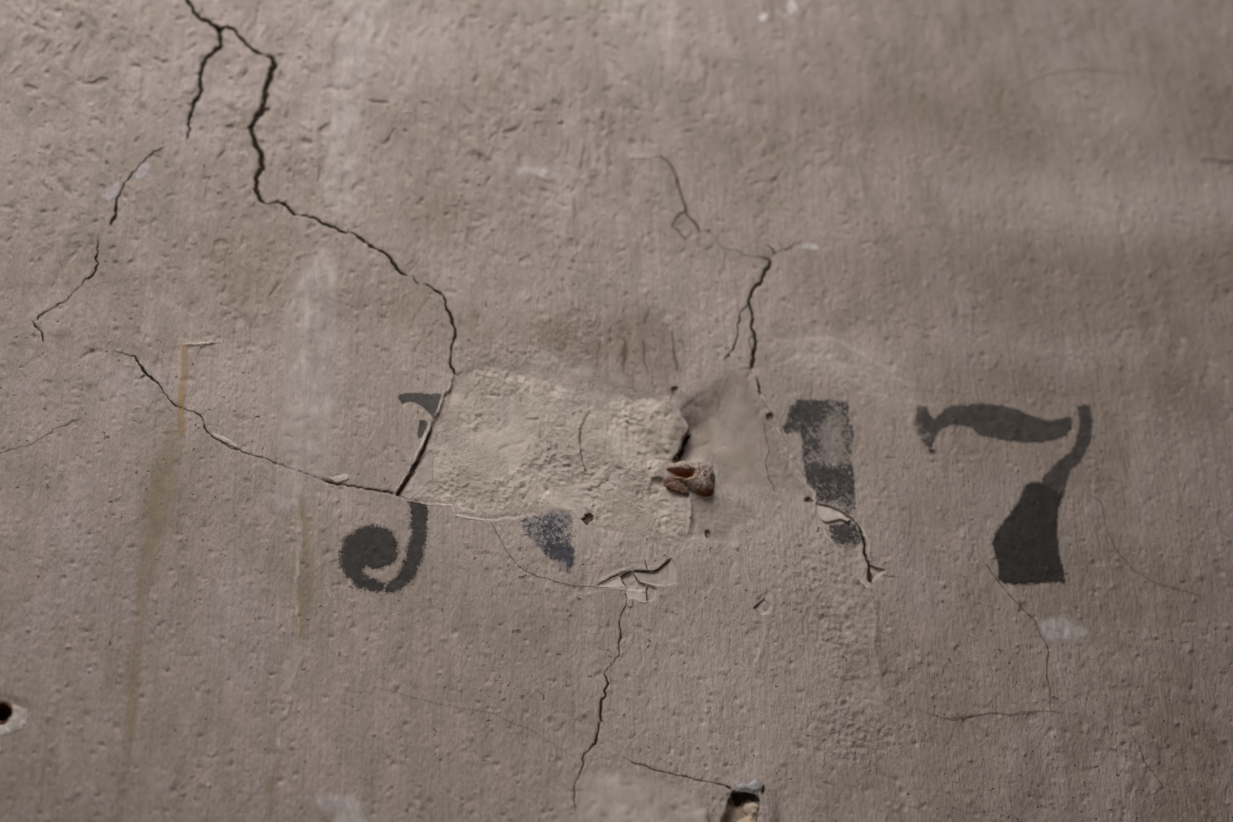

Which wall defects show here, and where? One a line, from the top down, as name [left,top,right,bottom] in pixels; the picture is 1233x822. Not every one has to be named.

crack [33,0,457,374]
crack [631,155,700,239]
crack [724,244,793,393]
crack [119,352,393,494]
spalling [394,351,894,615]
spalling [0,705,28,752]
crack [573,608,625,805]
crack [631,761,731,789]
spalling [720,778,765,822]